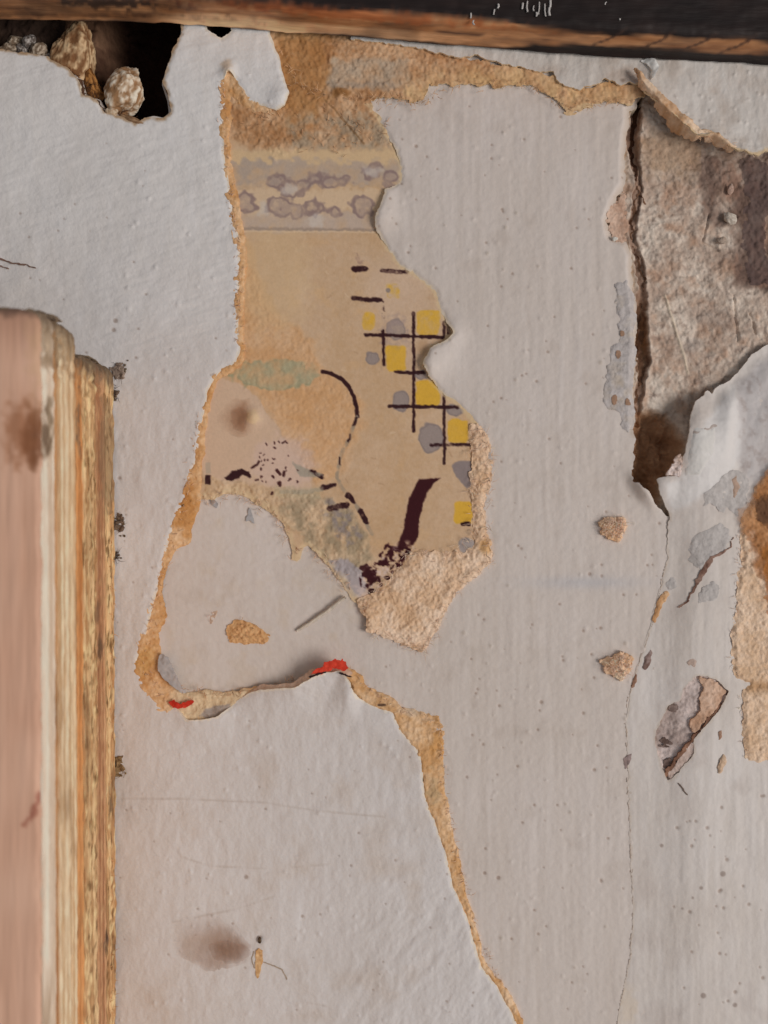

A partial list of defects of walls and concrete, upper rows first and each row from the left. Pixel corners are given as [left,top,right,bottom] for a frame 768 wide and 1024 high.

flaking render [351,36,768,516]
peeling [0,19,517,1024]
spalling [655,659,728,779]